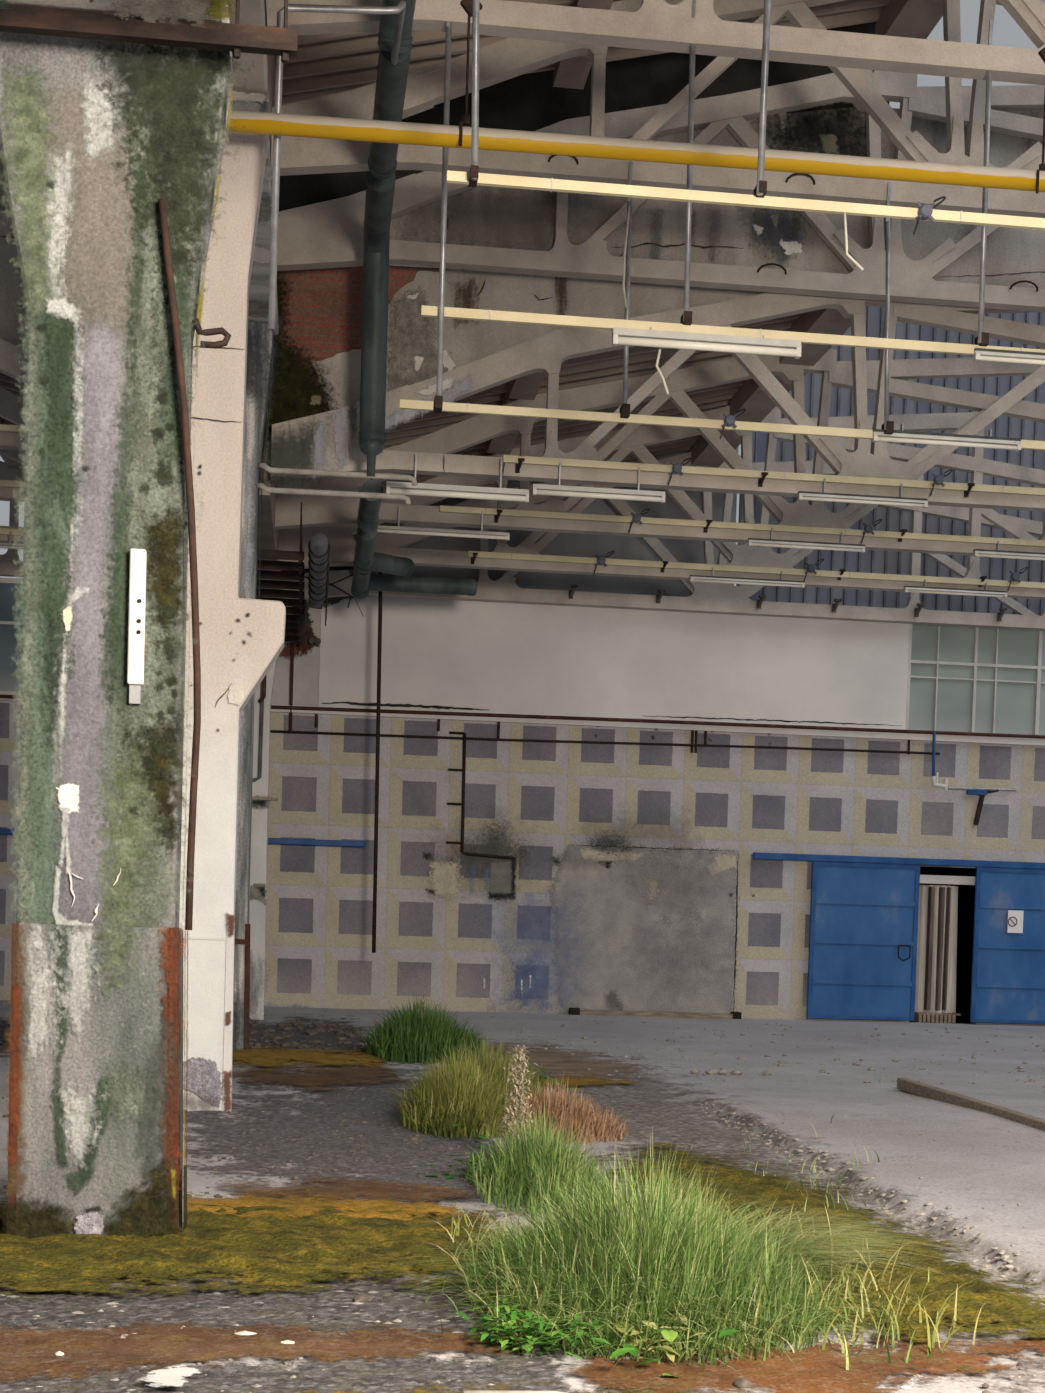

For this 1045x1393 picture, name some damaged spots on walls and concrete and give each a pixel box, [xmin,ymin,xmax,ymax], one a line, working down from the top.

damp [1,44,242,1057]
damp [244,272,360,599]
rust [7,927,27,1195]
efflorescence [61,1089,105,1167]
rust [142,927,188,1231]
spalling [183,1057,223,1110]